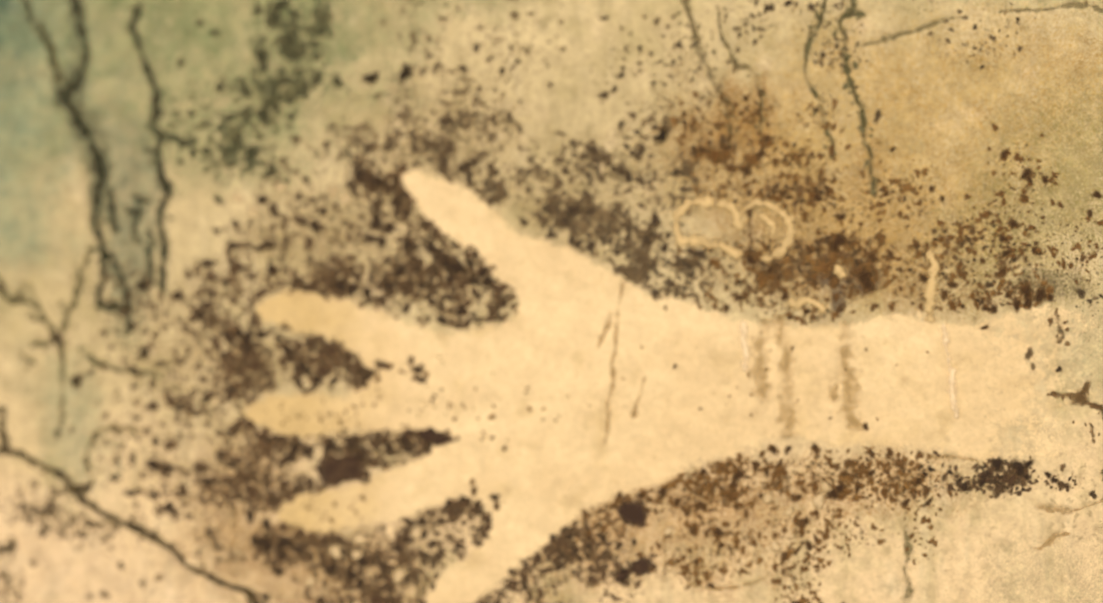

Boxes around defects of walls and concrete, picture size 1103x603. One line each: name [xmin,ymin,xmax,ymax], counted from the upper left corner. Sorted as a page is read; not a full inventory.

crack [676,0,766,147]
crack [804,0,967,196]
crack [999,2,1103,14]
crack [0,0,198,431]
crack [1047,382,1103,443]
crack [0,406,262,603]
crack [1038,499,1103,549]